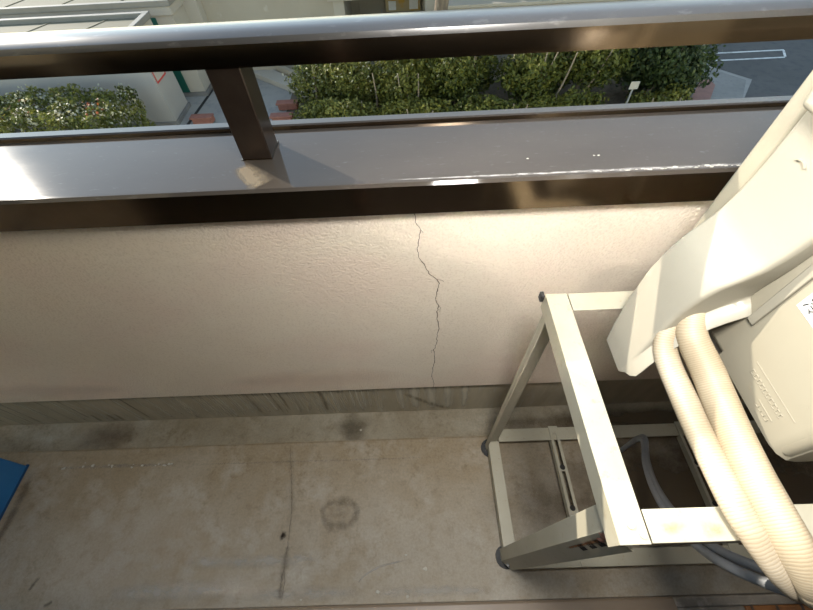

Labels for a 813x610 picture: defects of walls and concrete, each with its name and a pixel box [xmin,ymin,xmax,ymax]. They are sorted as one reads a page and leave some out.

crack [414,214,444,387]